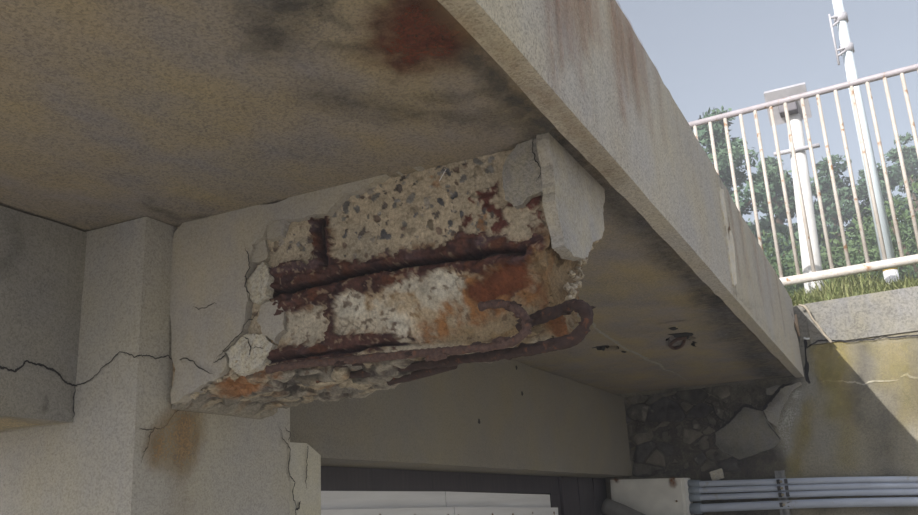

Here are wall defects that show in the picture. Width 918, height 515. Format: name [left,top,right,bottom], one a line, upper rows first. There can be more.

corrosion [373,0,468,71]
spalling [171,149,599,419]
crack [0,351,226,417]
spalling [666,327,698,350]
crack [790,309,918,385]
crack [281,426,308,513]
peeling [624,382,802,481]